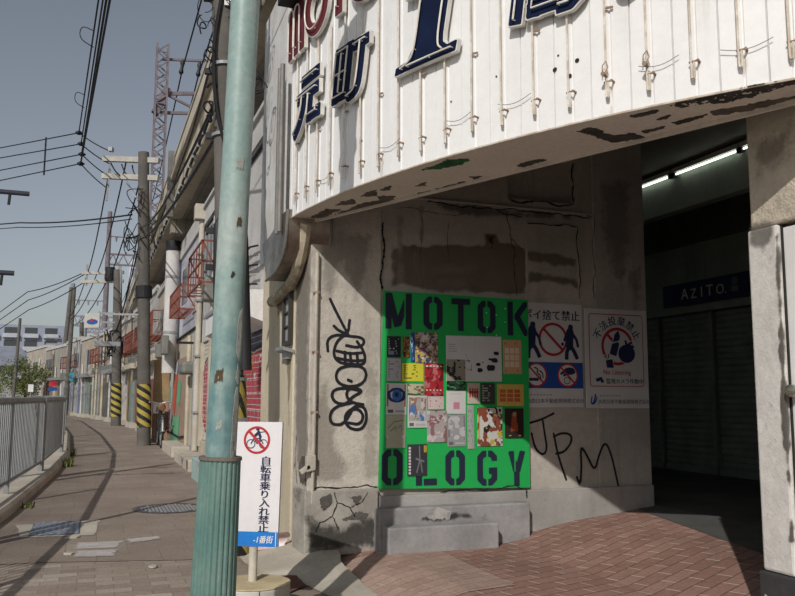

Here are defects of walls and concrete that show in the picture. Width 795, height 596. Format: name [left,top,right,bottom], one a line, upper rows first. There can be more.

peeling [311,186,396,218]
crack [378,222,386,289]
peeling [421,159,470,171]
peeling [415,176,482,194]
leakage [392,234,577,294]
crack [403,164,595,299]
peeling [517,159,547,167]
leakage [751,222,791,460]
crack [294,438,377,533]